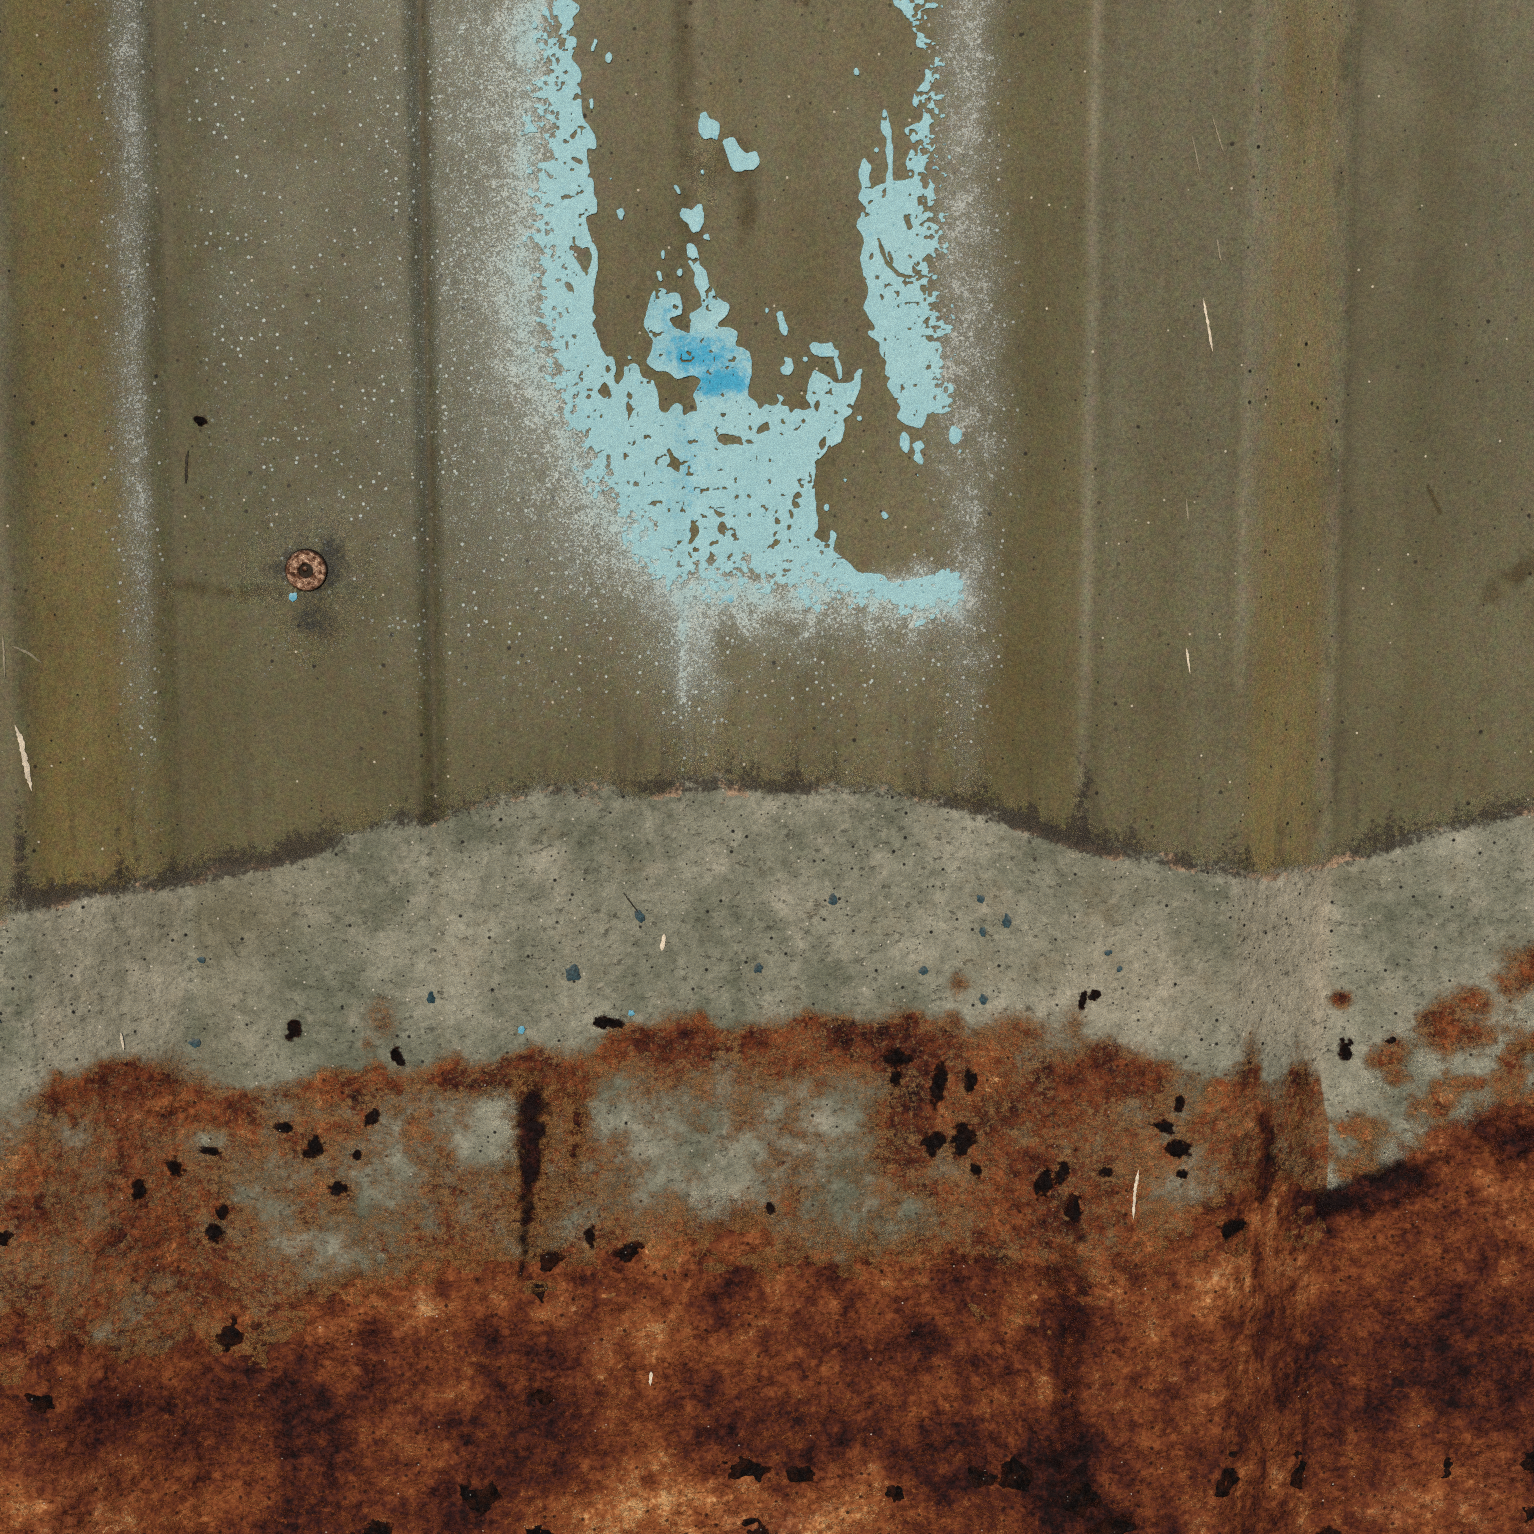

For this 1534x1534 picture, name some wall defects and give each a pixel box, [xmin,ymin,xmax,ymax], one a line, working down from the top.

peeling [513,0,964,627]
peeling [284,1020,301,1042]
peeling [390,1047,405,1069]
peeling [593,1015,625,1030]
peeling [1078,989,1101,1010]
peeling [1338,1037,1354,1061]
peeling [930,1061,978,1111]
peeling [302,1135,326,1158]
peeling [920,1122,982,1179]
peeling [1149,1095,1192,1179]
peeling [1033,1161,1083,1224]
rust [0,941,1534,1534]